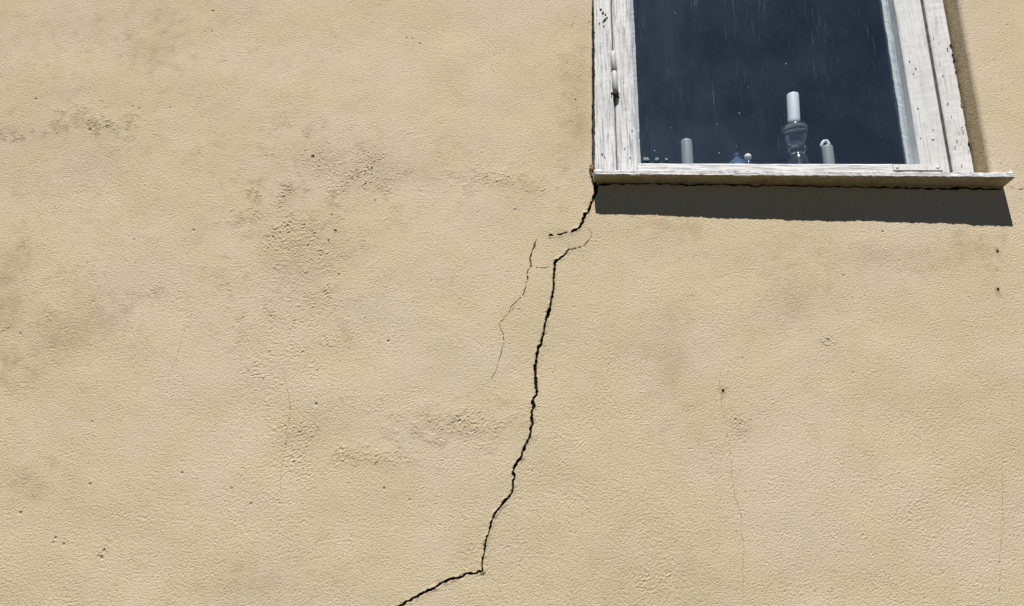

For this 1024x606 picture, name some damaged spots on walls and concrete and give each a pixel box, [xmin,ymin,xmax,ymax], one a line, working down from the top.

crack [399,0,1024,606]